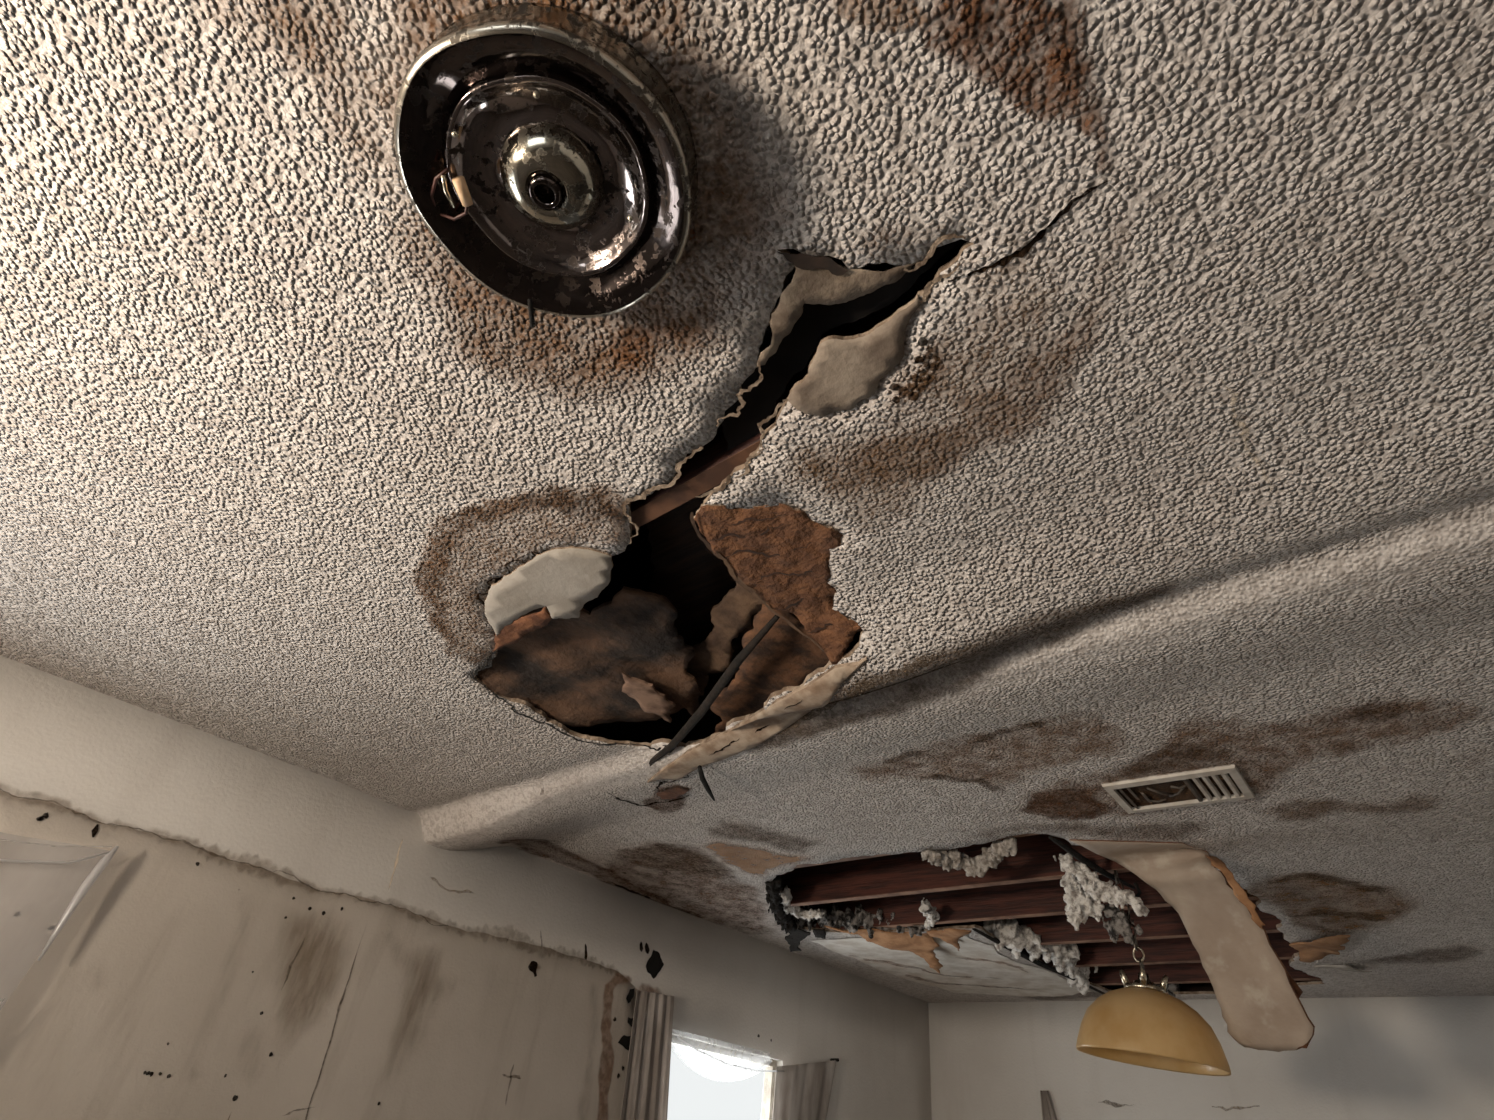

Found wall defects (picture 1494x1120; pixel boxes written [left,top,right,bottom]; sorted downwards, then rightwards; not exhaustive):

leakage [409,0,684,46]
leakage [860,0,1101,133]
leakage [423,65,757,384]
crack [716,180,1110,478]
spalling [622,446,703,544]
spalling [472,475,867,812]
leakage [1023,703,1472,838]
peeling [0,790,637,1120]
leakage [501,839,764,932]
spalling [640,942,664,979]
leakage [785,928,826,952]
peeling [811,936,1093,997]